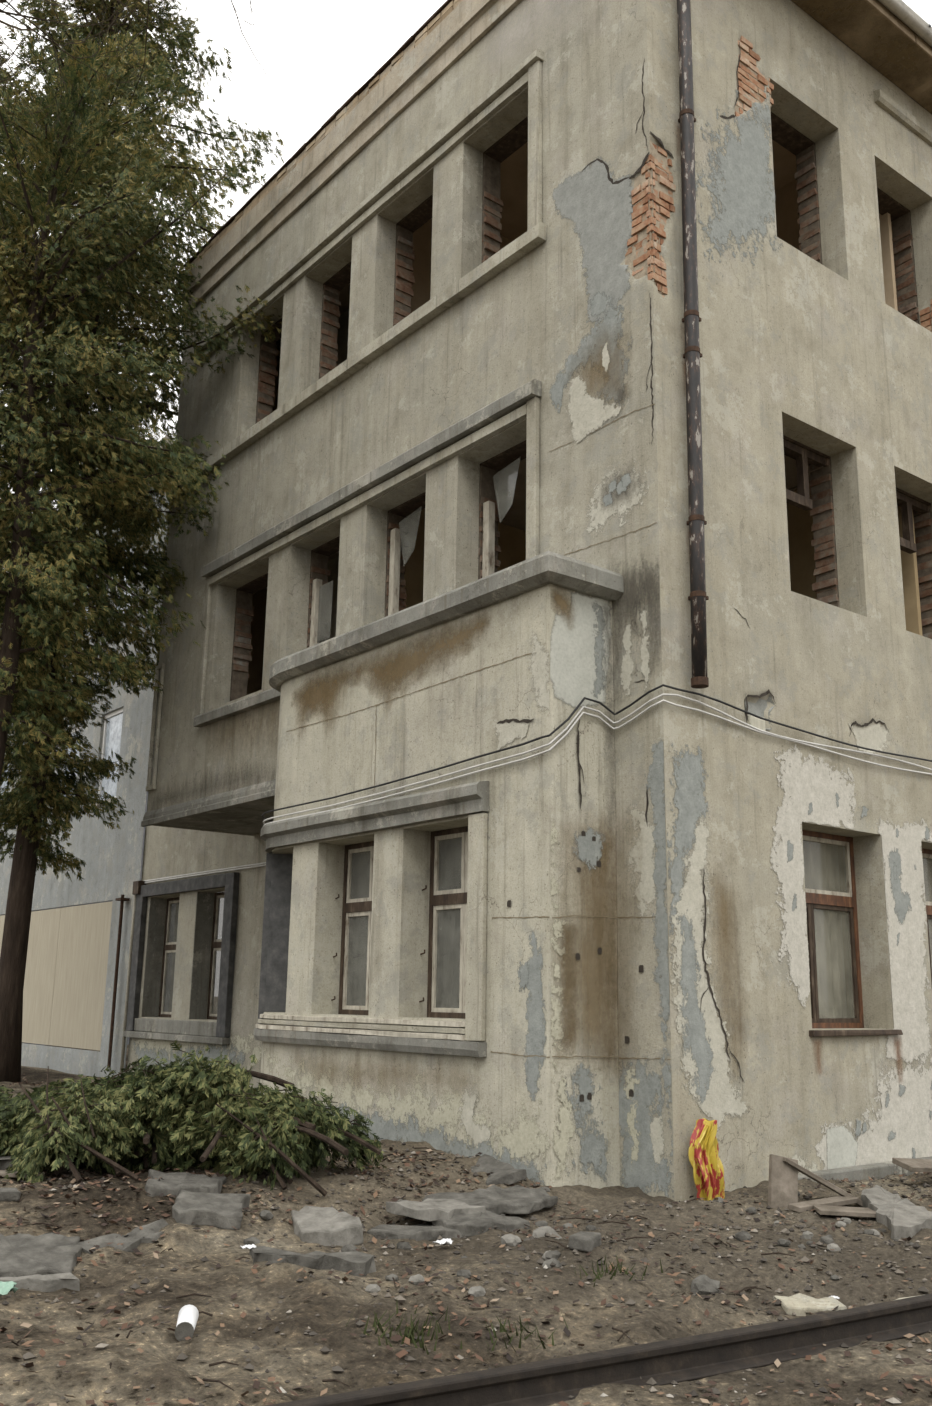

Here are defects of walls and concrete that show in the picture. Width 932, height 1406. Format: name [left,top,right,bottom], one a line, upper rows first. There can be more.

crack [635,63,648,149]
flaking render [720,35,774,119]
peeling [550,131,676,443]
spalling [848,718,888,753]
peeling [131,740,748,1196]
crack [700,871,745,1083]
peeling [770,744,932,1172]